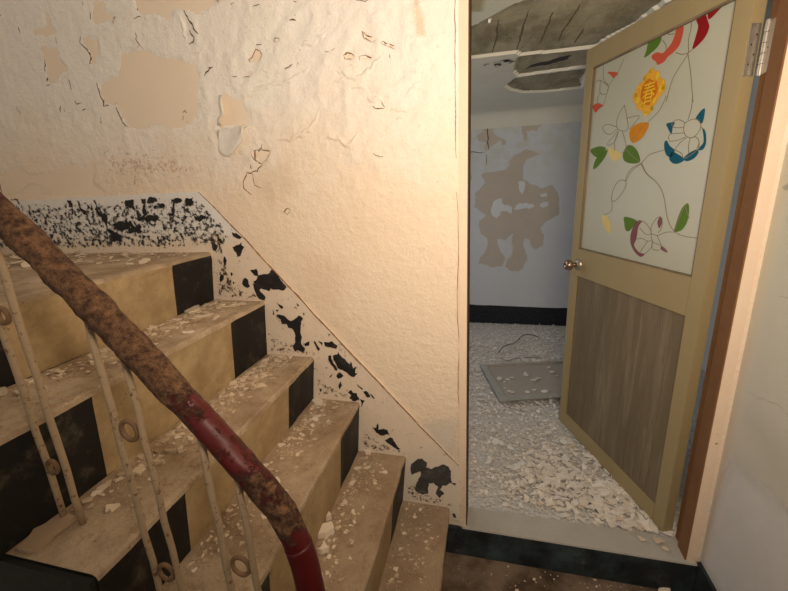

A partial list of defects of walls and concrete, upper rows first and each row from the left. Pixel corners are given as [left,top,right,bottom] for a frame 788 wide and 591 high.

spalling [471,0,662,91]
peeling [101,50,199,130]
peeling [216,94,248,156]
peeling [470,125,560,272]
peeling [11,197,286,301]
peeling [268,303,375,407]
peeling [362,424,400,455]
peeling [408,459,456,518]
peeling [17,514,78,554]